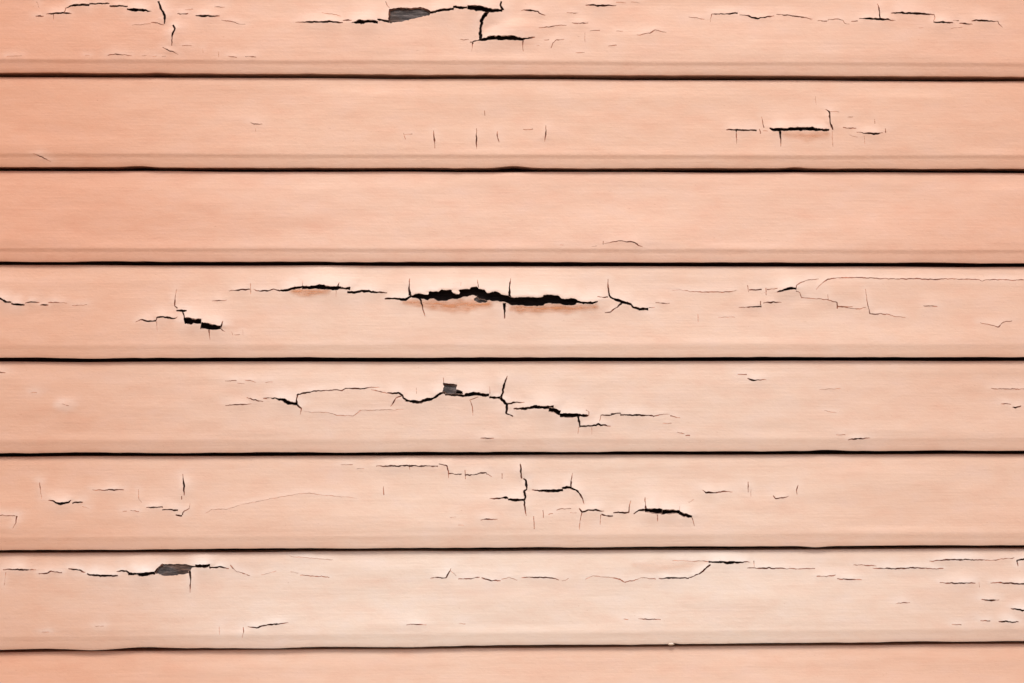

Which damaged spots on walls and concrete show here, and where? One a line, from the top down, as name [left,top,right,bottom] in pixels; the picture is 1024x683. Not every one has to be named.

crack [36,1,238,57]
peeling [295,1,535,51]
crack [690,4,1003,29]
crack [726,96,886,146]
crack [0,298,87,306]
crack [136,278,782,338]
crack [225,380,302,414]
crack [387,377,690,436]
crack [39,474,353,517]
crack [343,464,749,530]
peeling [3,564,233,589]
crack [749,558,1024,625]